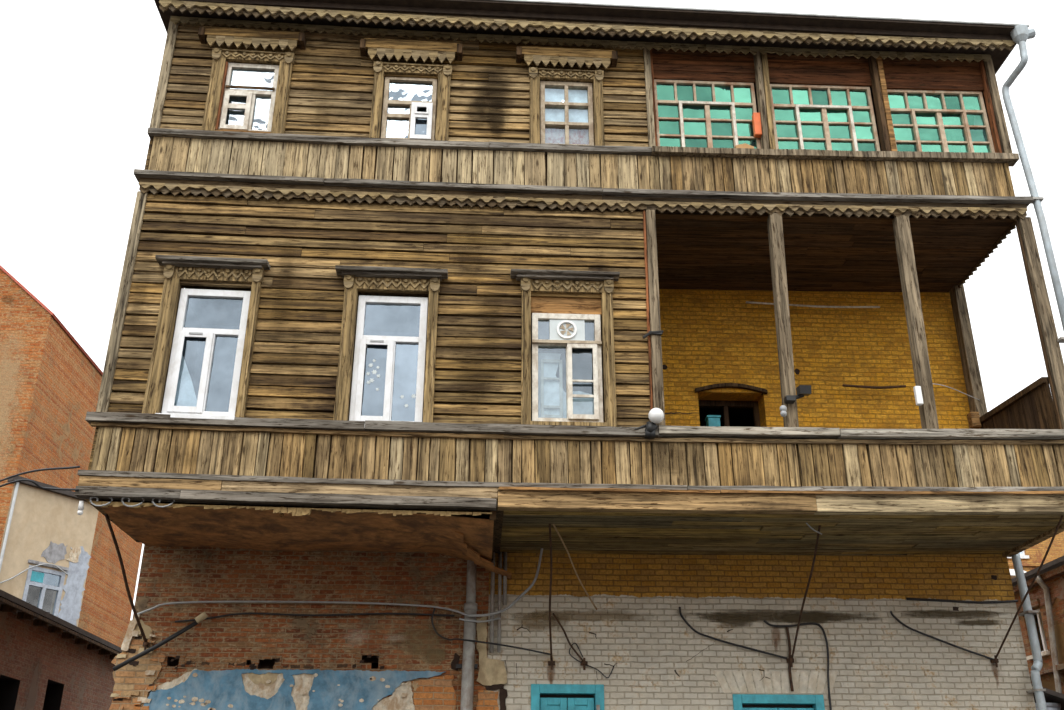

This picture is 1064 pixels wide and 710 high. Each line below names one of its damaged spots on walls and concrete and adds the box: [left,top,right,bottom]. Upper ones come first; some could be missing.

flaking render [41,541,91,626]
peeling [88,501,512,579]
peeling [109,614,460,710]
spalling [476,617,508,710]